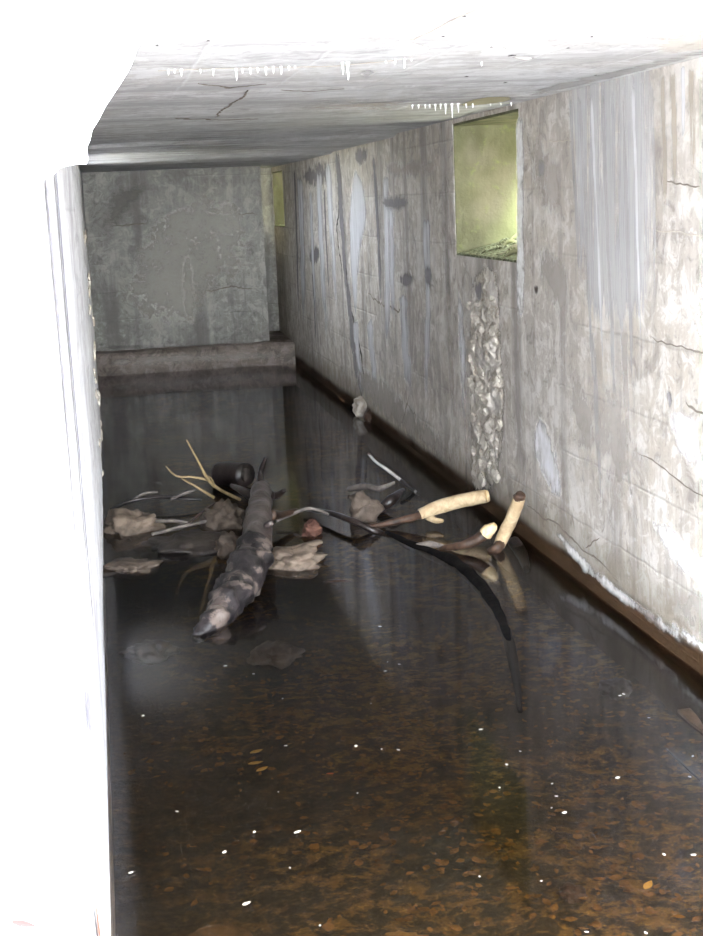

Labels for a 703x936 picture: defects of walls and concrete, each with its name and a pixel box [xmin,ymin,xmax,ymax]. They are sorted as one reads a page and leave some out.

crack [158,59,402,120]
water stain [294,163,336,335]
water stain [350,149,412,389]
water stain [535,58,697,494]
water stain [297,361,354,411]
spalling [466,267,505,491]
crack [652,337,703,354]
water stain [366,414,477,494]
crack [633,450,703,497]
water stain [474,502,506,527]
water stain [511,522,703,685]